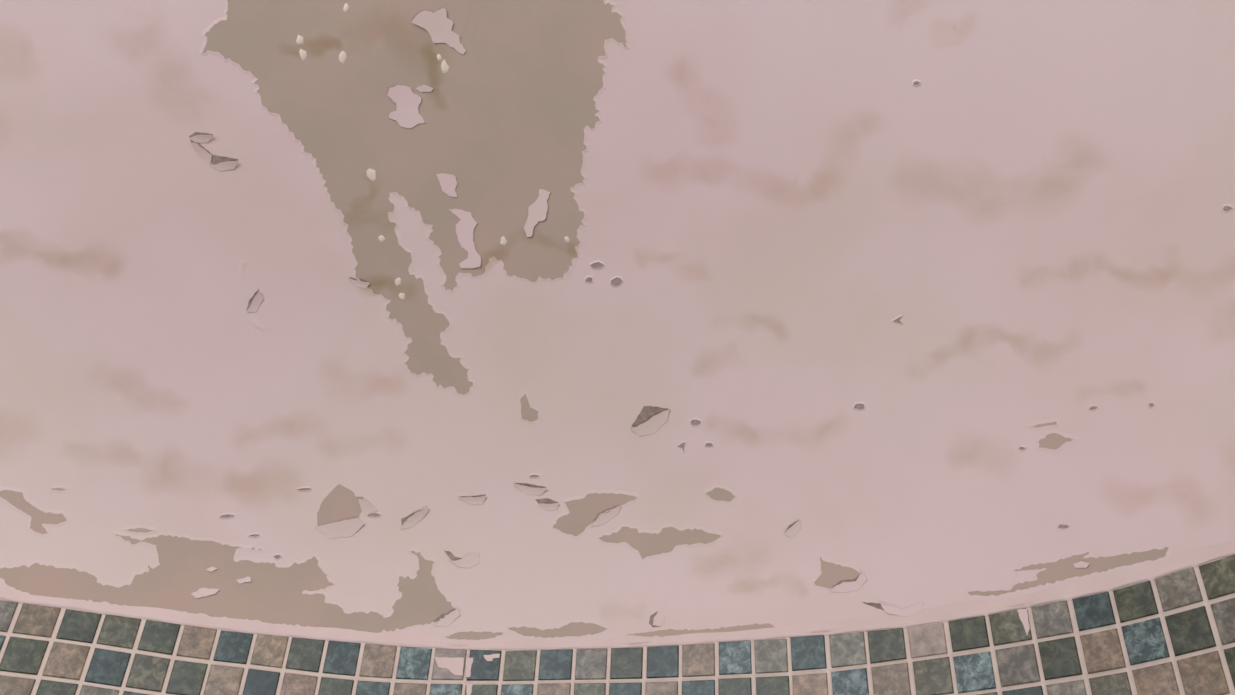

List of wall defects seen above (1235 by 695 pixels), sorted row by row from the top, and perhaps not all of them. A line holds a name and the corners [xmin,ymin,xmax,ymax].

peeling [189,132,239,171]
peeling [199,0,631,397]
peeling [630,406,670,436]
peeling [0,487,70,537]
peeling [315,484,382,538]
peeling [400,508,429,530]
peeling [514,473,724,562]
peeling [0,525,610,641]
peeling [811,553,924,616]
peeling [965,544,1172,600]
peeling [624,611,776,639]